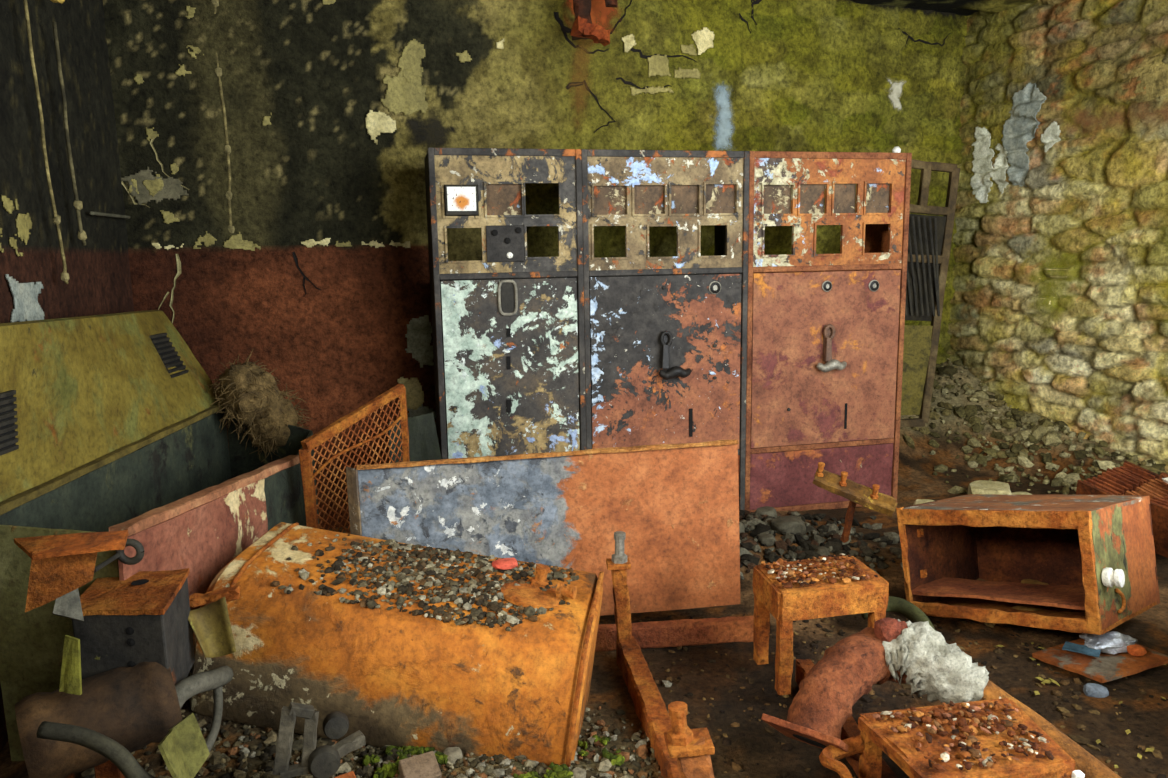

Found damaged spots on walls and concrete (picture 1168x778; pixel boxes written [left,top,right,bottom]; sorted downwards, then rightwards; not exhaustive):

corrosion [590,0,617,30]
spalling [621,34,636,53]
spalling [630,27,715,96]
peeling [365,39,428,145]
damp [406,112,455,152]
efflorescence [715,86,733,149]
damp [888,80,904,109]
peeling [1001,83,1061,187]
spalling [121,127,189,224]
peeling [152,231,261,251]
peeling [301,238,410,248]
spalling [5,274,45,322]